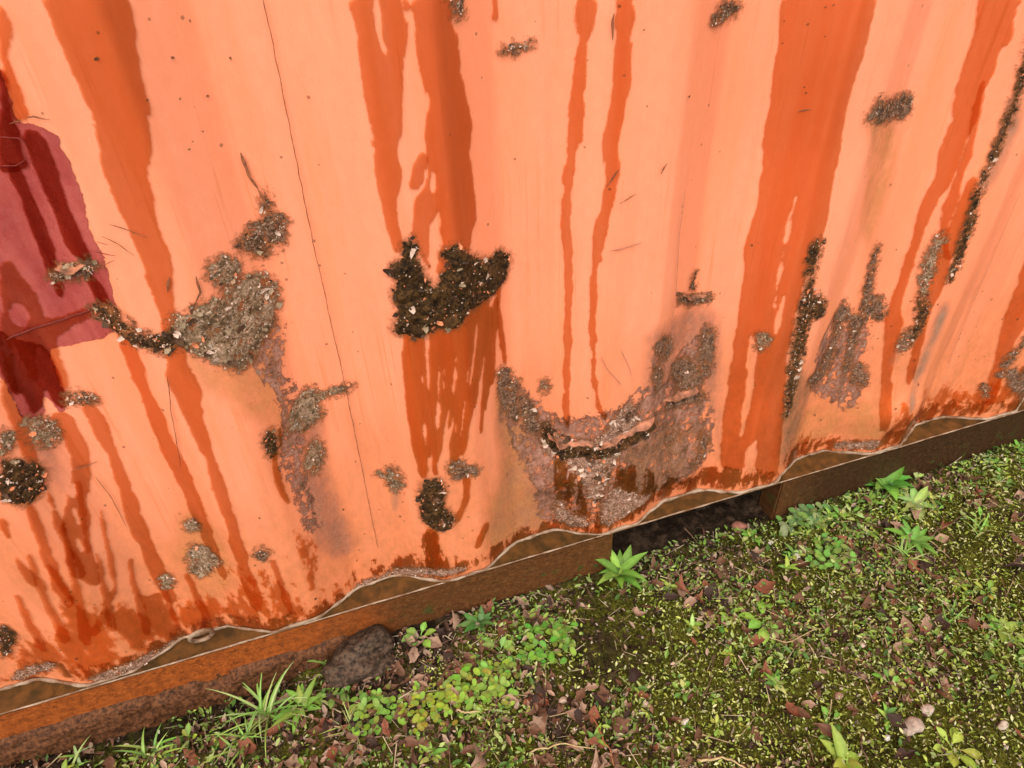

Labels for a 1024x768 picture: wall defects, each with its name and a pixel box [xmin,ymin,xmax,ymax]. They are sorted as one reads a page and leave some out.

rust [710,0,744,28]
rust [864,90,914,127]
peeling [44,254,105,284]
rust [917,230,949,297]
rust [0,414,63,507]
peeling [59,390,100,408]
peeling [83,299,191,358]
peeling [252,317,322,533]
rust [262,381,357,478]
peeling [498,322,716,530]
rust [780,238,889,421]
peeling [811,315,874,411]